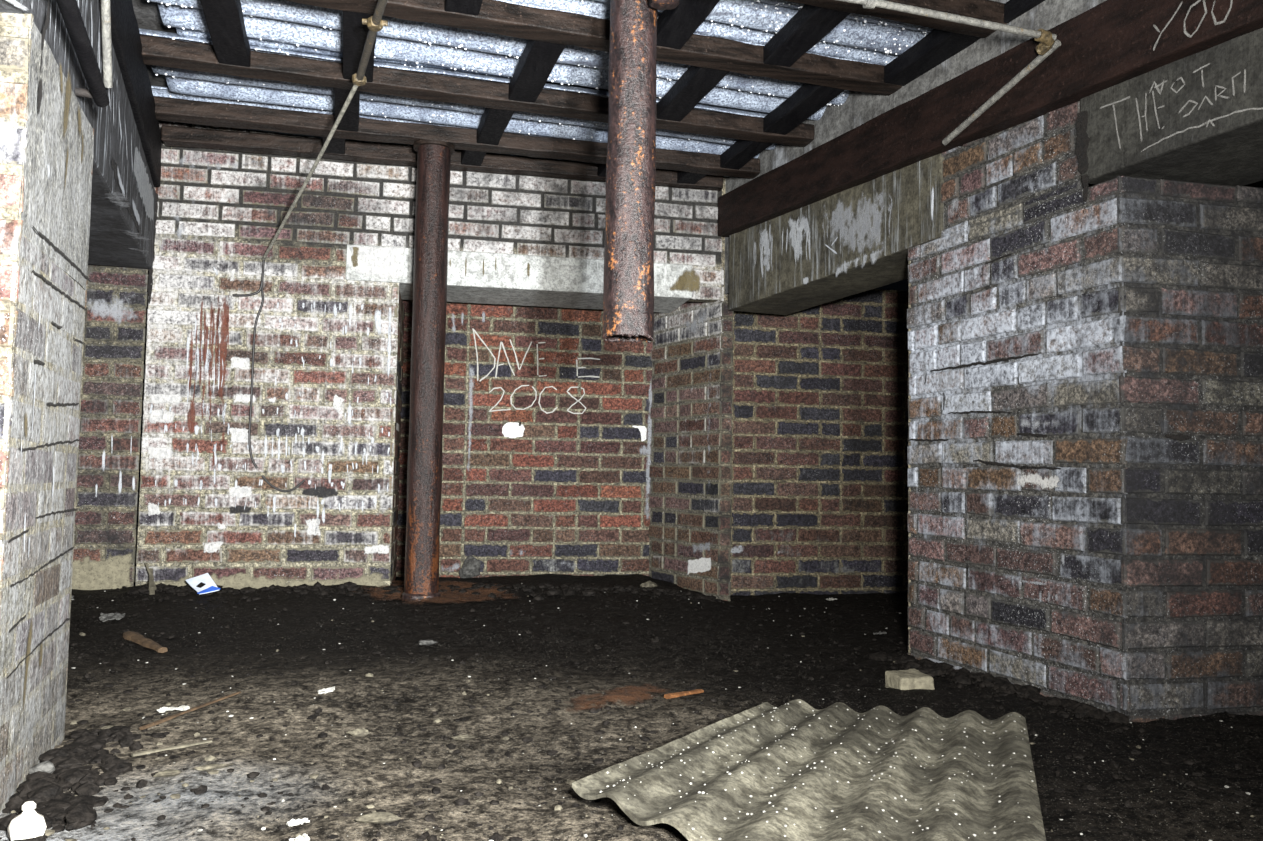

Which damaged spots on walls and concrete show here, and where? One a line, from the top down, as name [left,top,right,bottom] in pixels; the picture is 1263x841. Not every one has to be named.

spalling [836,251,881,277]